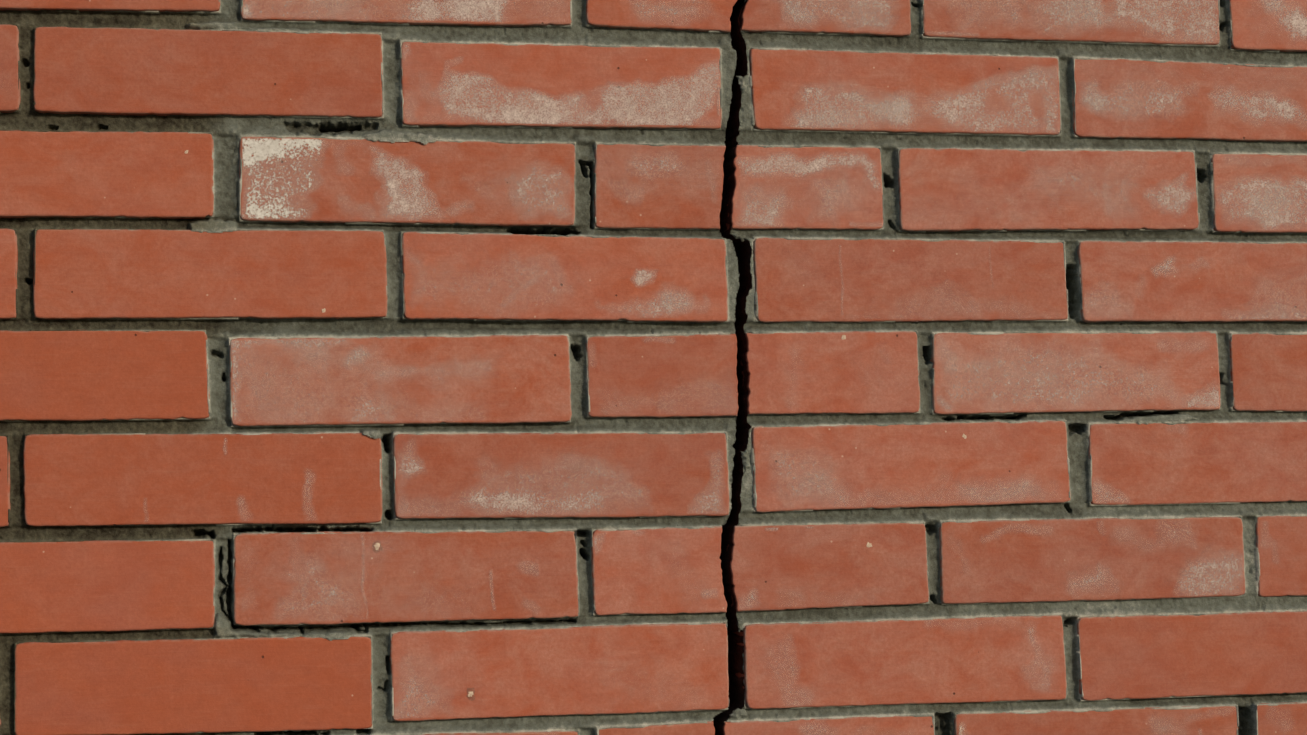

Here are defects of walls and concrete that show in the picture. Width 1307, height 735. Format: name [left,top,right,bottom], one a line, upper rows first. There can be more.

water stain [1269,2,1307,35]
water stain [442,65,720,125]
water stain [798,72,1057,131]
water stain [1219,94,1294,118]
water stain [242,138,322,219]
water stain [376,153,434,216]
crack [713,0,752,735]